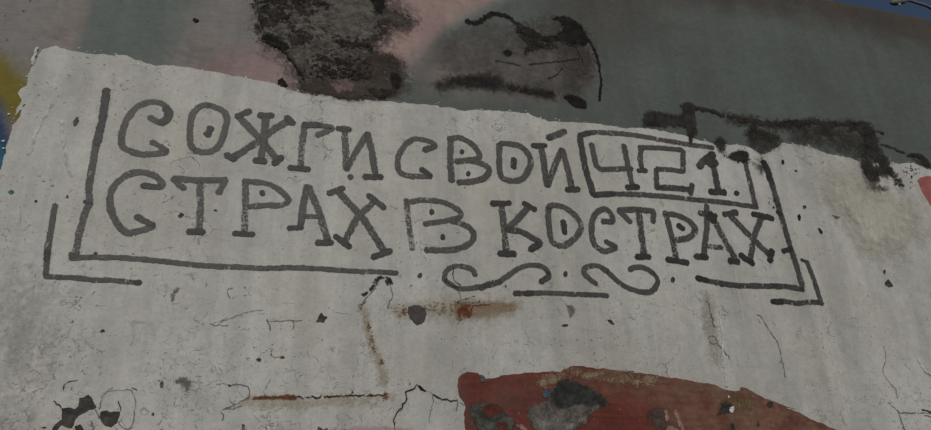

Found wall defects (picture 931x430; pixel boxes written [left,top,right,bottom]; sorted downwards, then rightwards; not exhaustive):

rust [424,299,515,324]
rust [360,301,385,380]
peeling [42,387,137,430]
rust [253,391,389,405]
crack [393,384,463,430]
peeling [470,367,662,430]
crack [882,346,931,430]